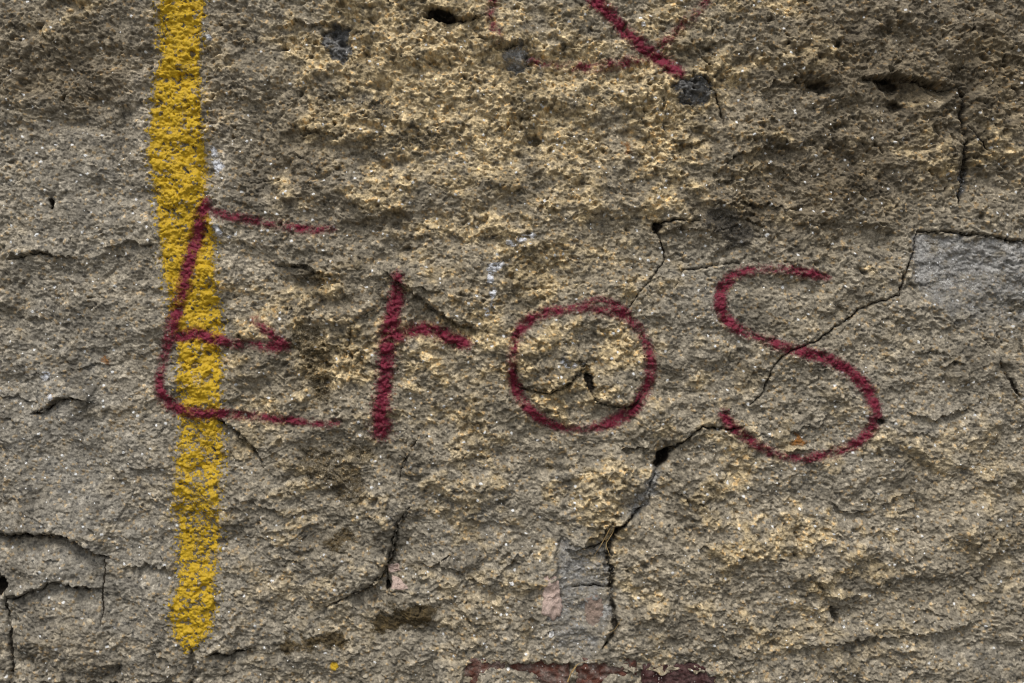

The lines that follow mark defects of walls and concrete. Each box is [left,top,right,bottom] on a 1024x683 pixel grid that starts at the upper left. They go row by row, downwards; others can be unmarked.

crack [864,77,988,204]
crack [629,219,739,307]
crack [649,231,1024,485]
crack [0,531,68,539]
crack [5,554,108,683]
crack [332,507,410,604]
crack [574,510,636,647]